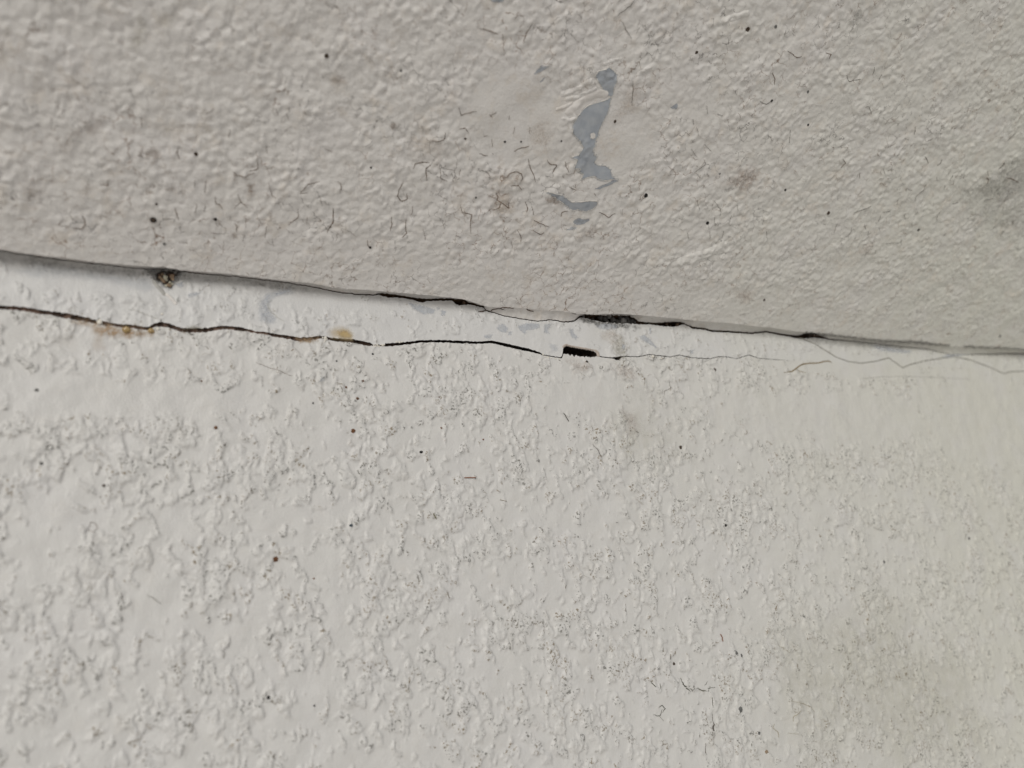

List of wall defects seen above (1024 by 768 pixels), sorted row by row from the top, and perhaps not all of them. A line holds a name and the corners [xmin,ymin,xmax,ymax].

peeling [545,67,619,225]
crack [0,251,1024,395]